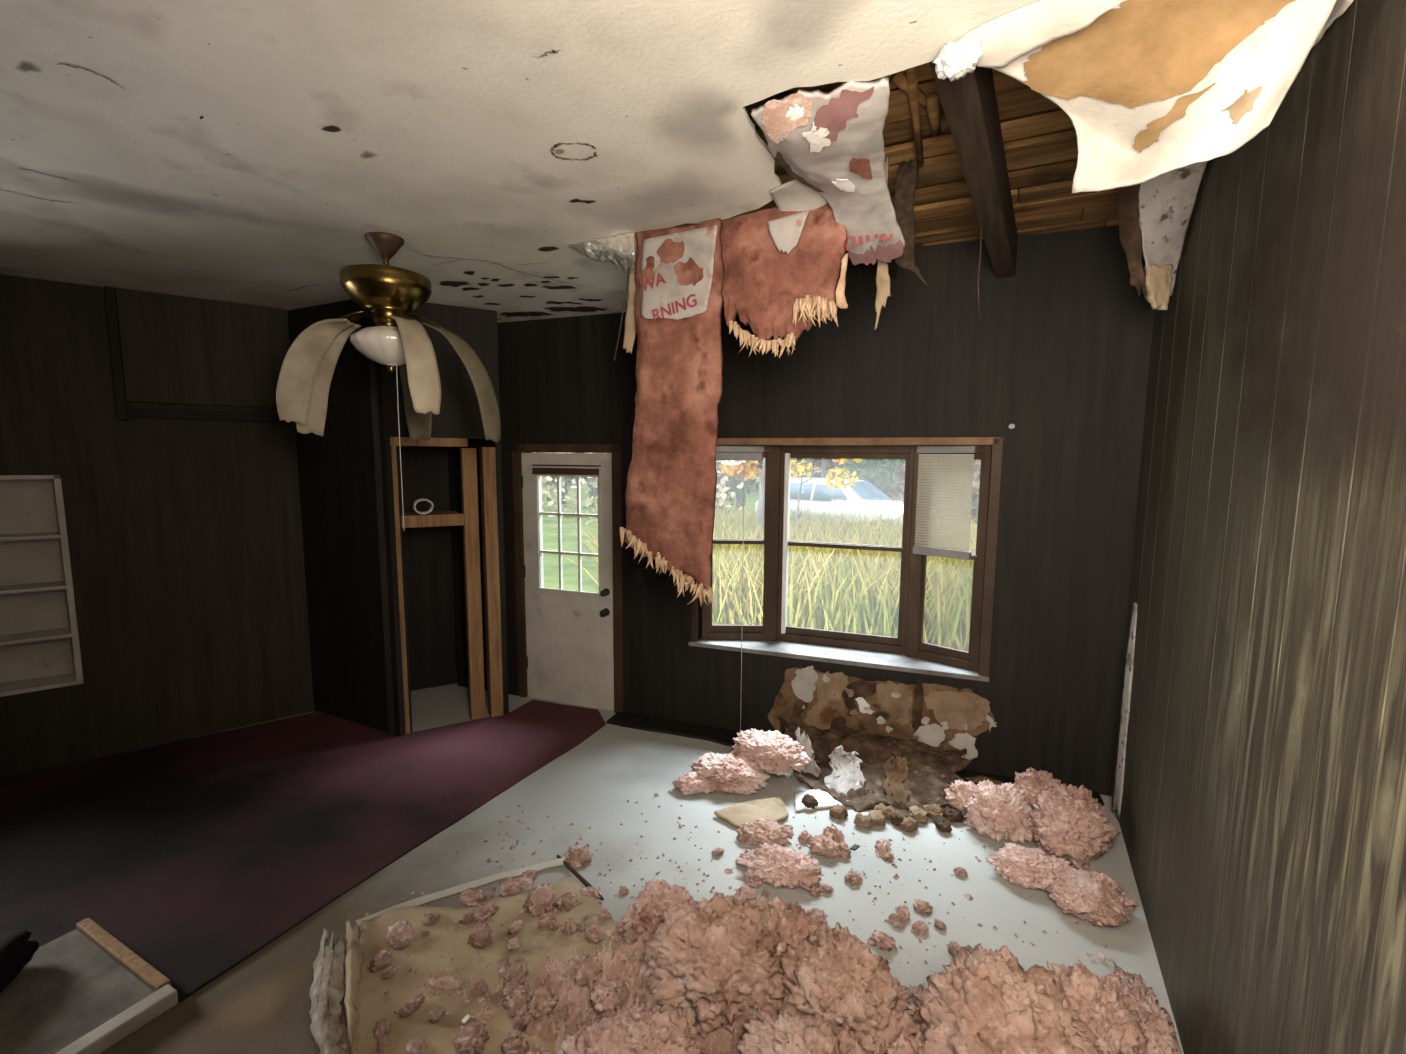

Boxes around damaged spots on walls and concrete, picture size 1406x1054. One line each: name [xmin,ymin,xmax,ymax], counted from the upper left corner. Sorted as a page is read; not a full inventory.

peeling [1312,0,1353,48]
peeling [958,0,1295,152]
water stain [440,271,607,320]
peeling [768,666,997,769]